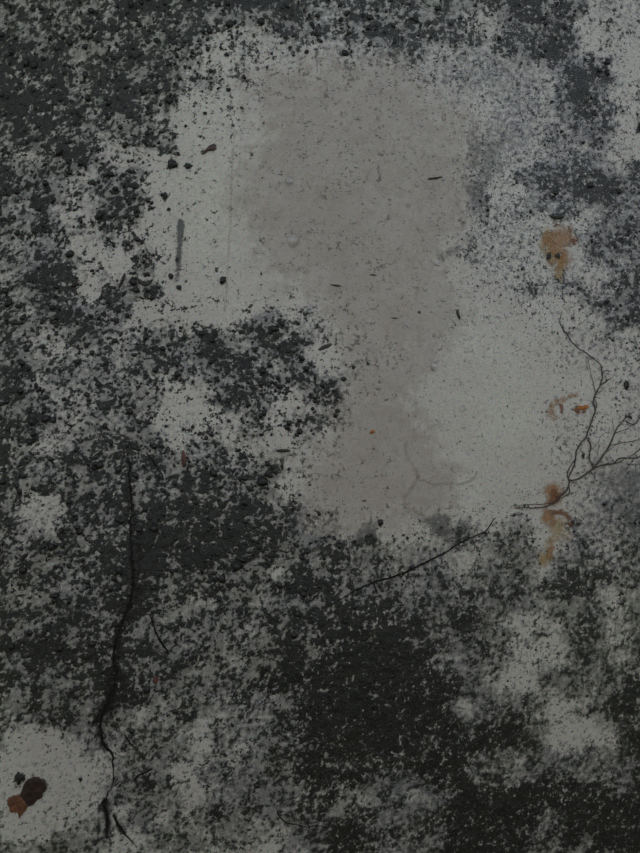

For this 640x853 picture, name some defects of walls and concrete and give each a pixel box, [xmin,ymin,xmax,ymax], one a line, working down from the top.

damp [0,0,640,438]
corrosion [541,226,577,280]
corrosion [550,394,589,418]
damp [0,336,640,853]
crack [333,518,495,604]
corrosion [540,484,573,564]
crack [92,453,169,846]